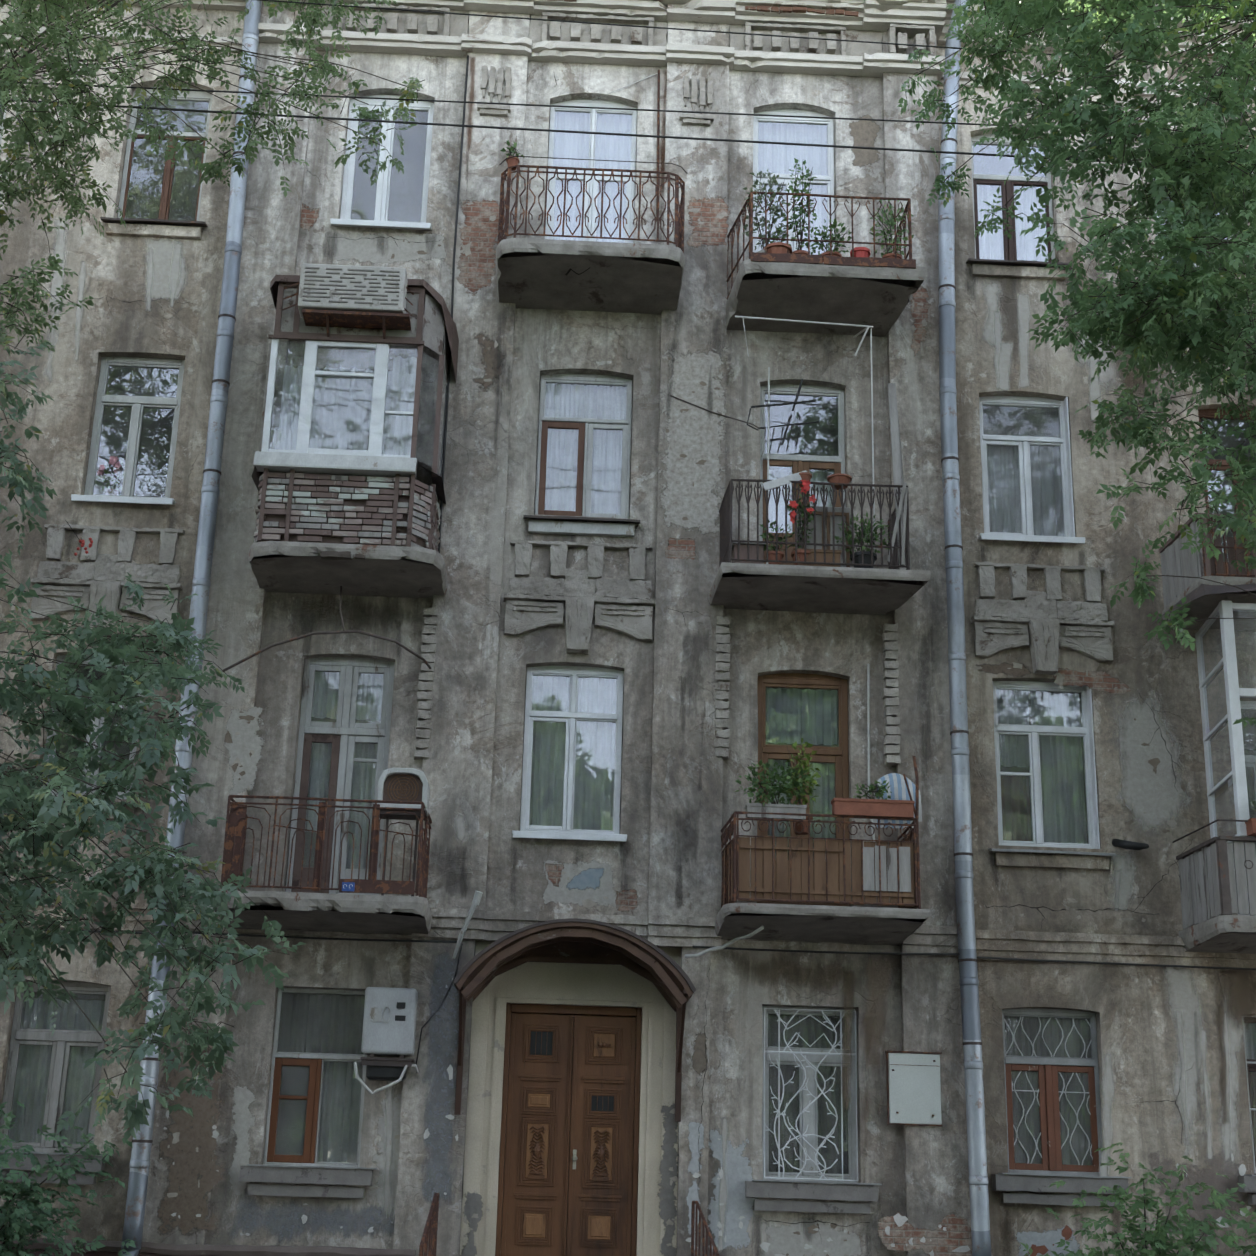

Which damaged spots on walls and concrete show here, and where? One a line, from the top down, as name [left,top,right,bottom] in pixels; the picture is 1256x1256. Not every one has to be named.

spalling [300,203,320,230]
spalling [326,199,499,296]
spalling [687,196,731,248]
flaking render [224,706,265,795]
peeling [543,860,638,911]
flaking render [151,1044,402,1243]
peeling [658,1103,861,1256]
spalling [877,1212,972,1256]
peeling [1015,1225,1080,1256]